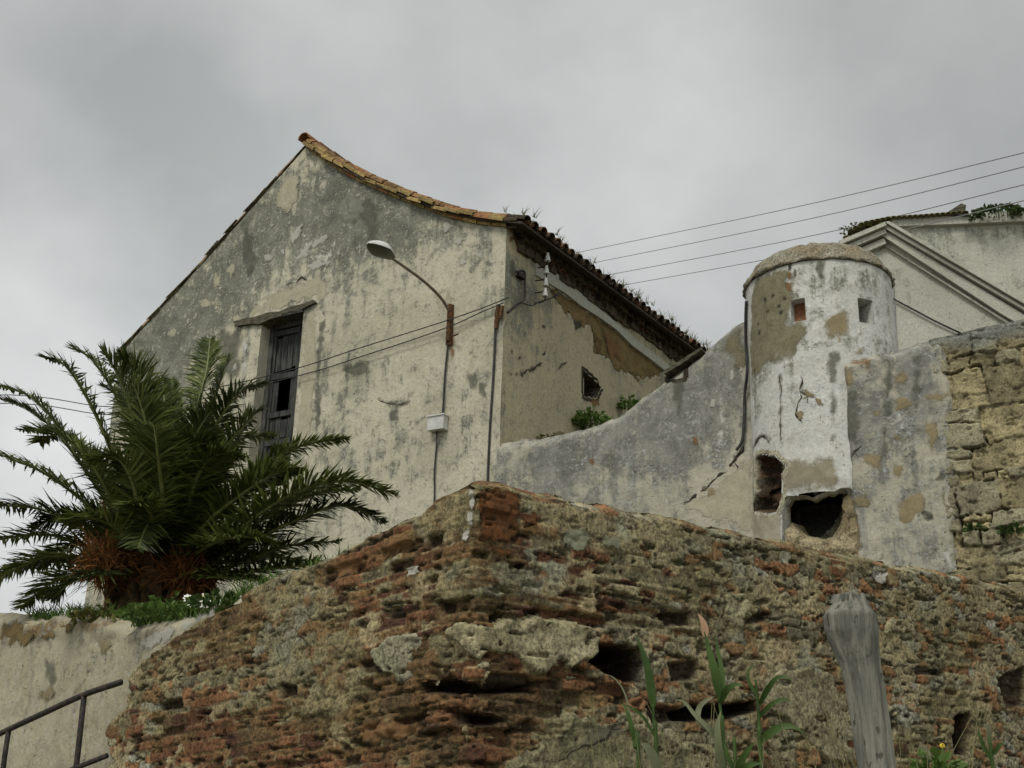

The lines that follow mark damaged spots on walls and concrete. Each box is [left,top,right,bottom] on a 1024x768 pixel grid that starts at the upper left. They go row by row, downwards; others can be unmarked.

flaking render [276,174,300,213]
leakage [221,329,247,377]
leakage [315,312,325,430]
leakage [344,361,369,376]
leakage [467,373,486,396]
crack [522,347,566,374]
flaking render [551,289,690,384]
flaking render [725,270,806,380]
flaking render [825,310,860,341]
crack [683,375,815,504]
efflorescence [462,489,475,541]
spalling [752,448,793,541]